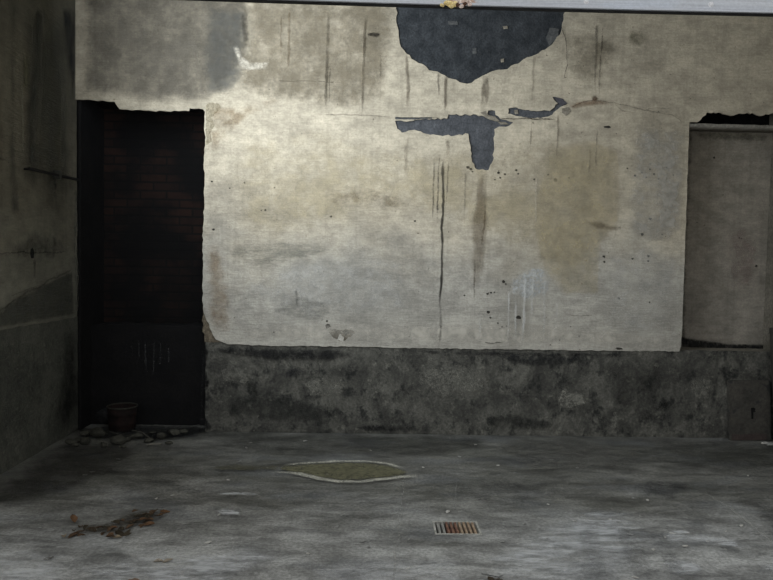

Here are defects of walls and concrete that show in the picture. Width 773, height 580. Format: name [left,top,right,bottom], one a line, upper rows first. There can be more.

flaking render [396,7,564,84]
flaking render [395,97,571,180]
spalling [690,113,770,125]
damp [244,349,348,377]